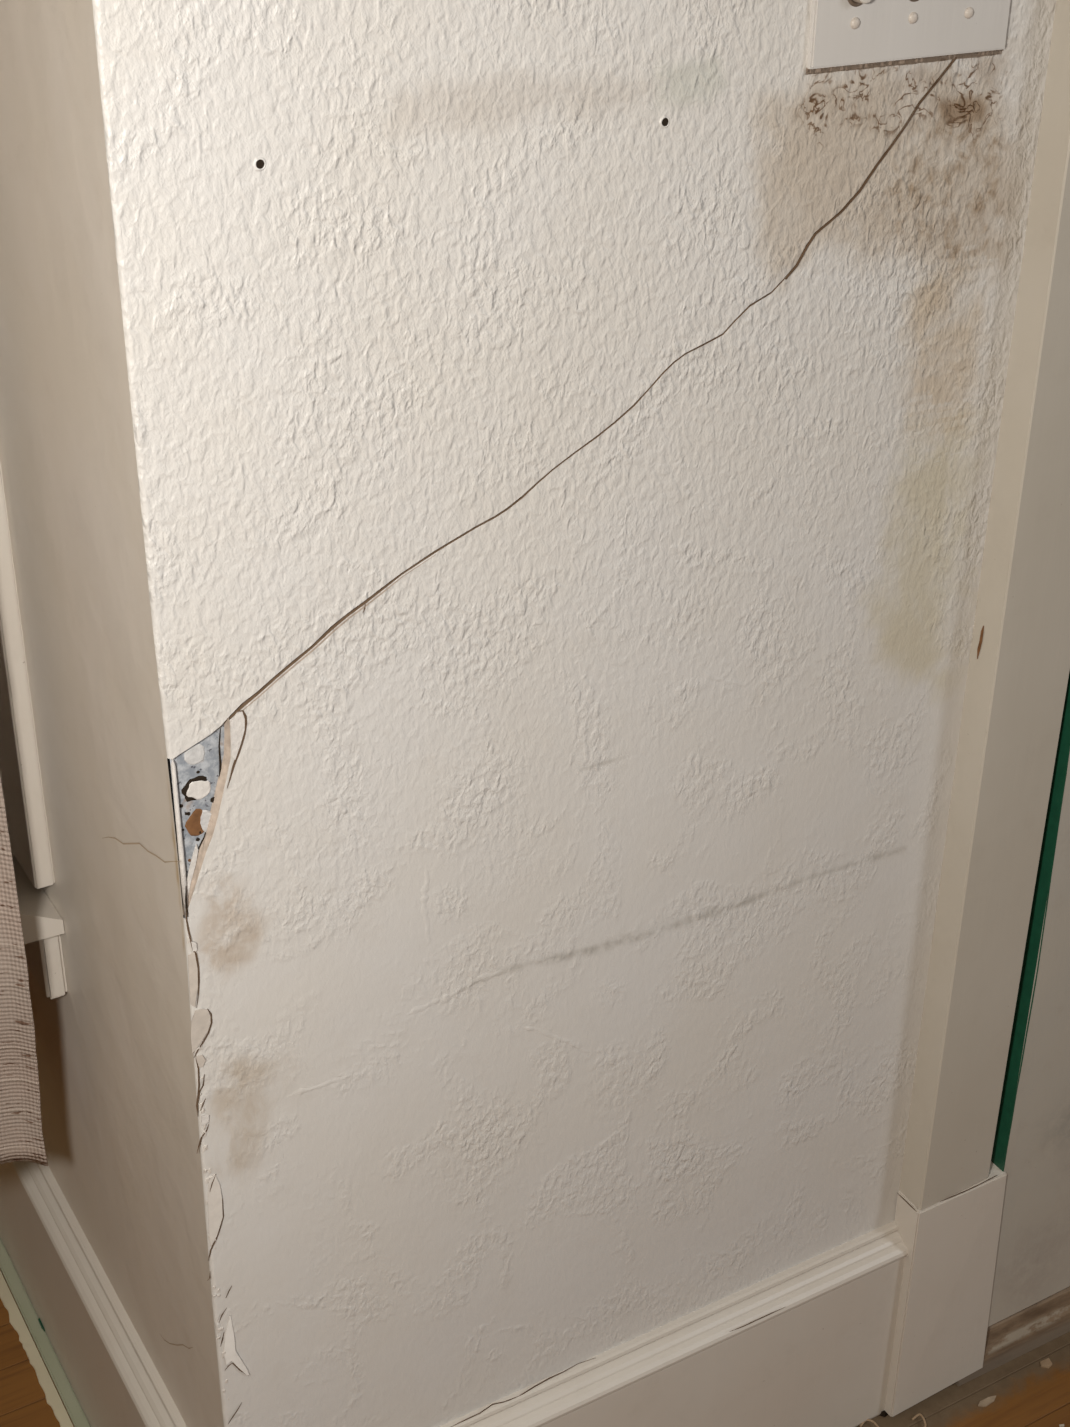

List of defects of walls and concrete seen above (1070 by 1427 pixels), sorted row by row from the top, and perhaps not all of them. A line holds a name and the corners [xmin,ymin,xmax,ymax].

crack [227,57,957,788]
water stain [809,76,869,131]
water stain [950,66,995,126]
spalling [170,712,250,1424]